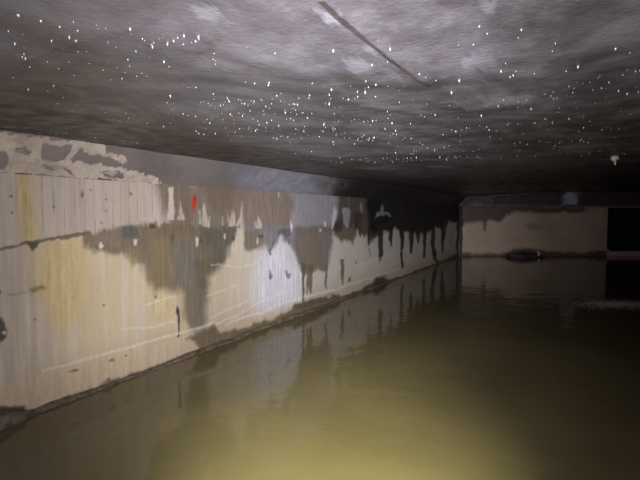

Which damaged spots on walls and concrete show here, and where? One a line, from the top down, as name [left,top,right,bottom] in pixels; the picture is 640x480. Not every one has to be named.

peeling [0,131,163,184]
damp [0,162,610,414]